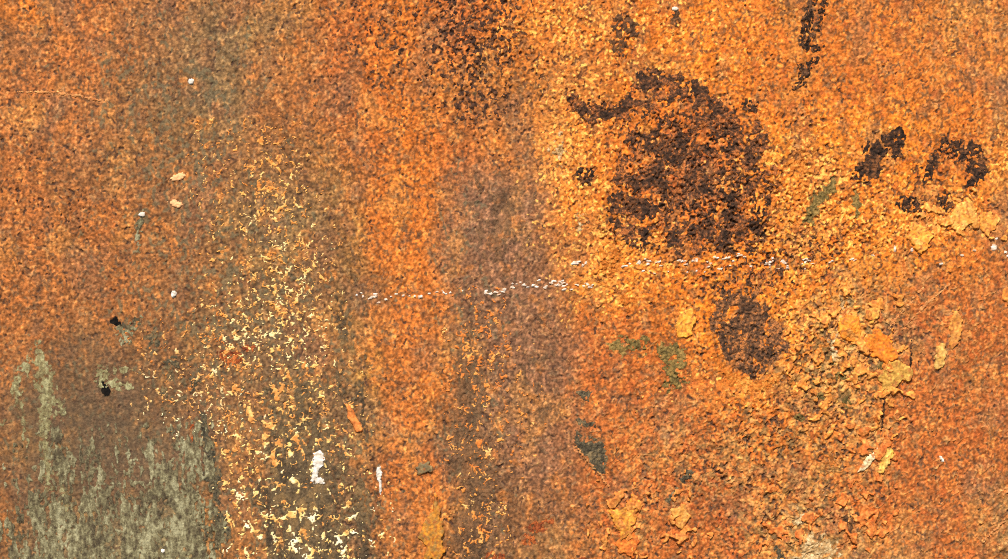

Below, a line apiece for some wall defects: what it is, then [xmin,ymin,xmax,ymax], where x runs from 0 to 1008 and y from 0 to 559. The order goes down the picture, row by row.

rust [343,0,530,132]
rust [609,11,640,57]
rust [895,135,1008,255]
rust [217,345,256,366]
peeling [125,115,401,559]
rust [563,67,916,559]
rust [934,306,963,370]
rust [344,403,363,433]
rust [415,461,433,475]
spalling [665,469,694,504]
rust [418,495,446,559]